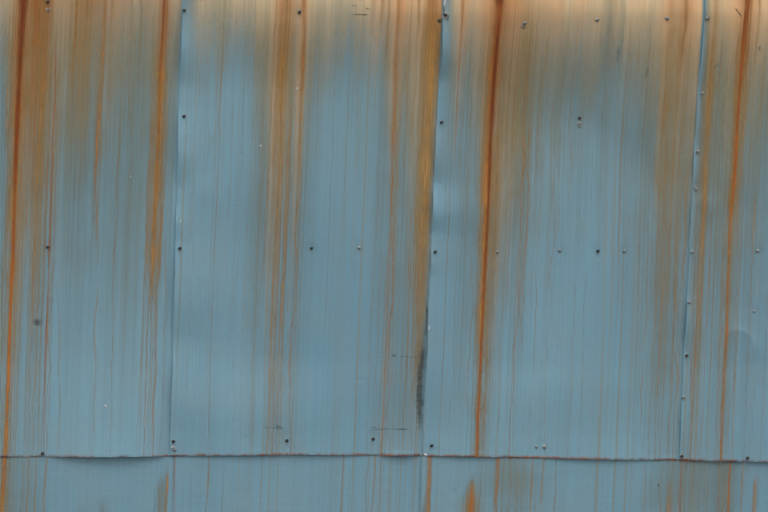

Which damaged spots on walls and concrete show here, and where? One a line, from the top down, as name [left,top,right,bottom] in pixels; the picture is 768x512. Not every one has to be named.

corrosion [0,0,56,512]
corrosion [147,0,168,280]
corrosion [380,0,503,459]
corrosion [720,0,750,411]
corrosion [495,456,606,502]